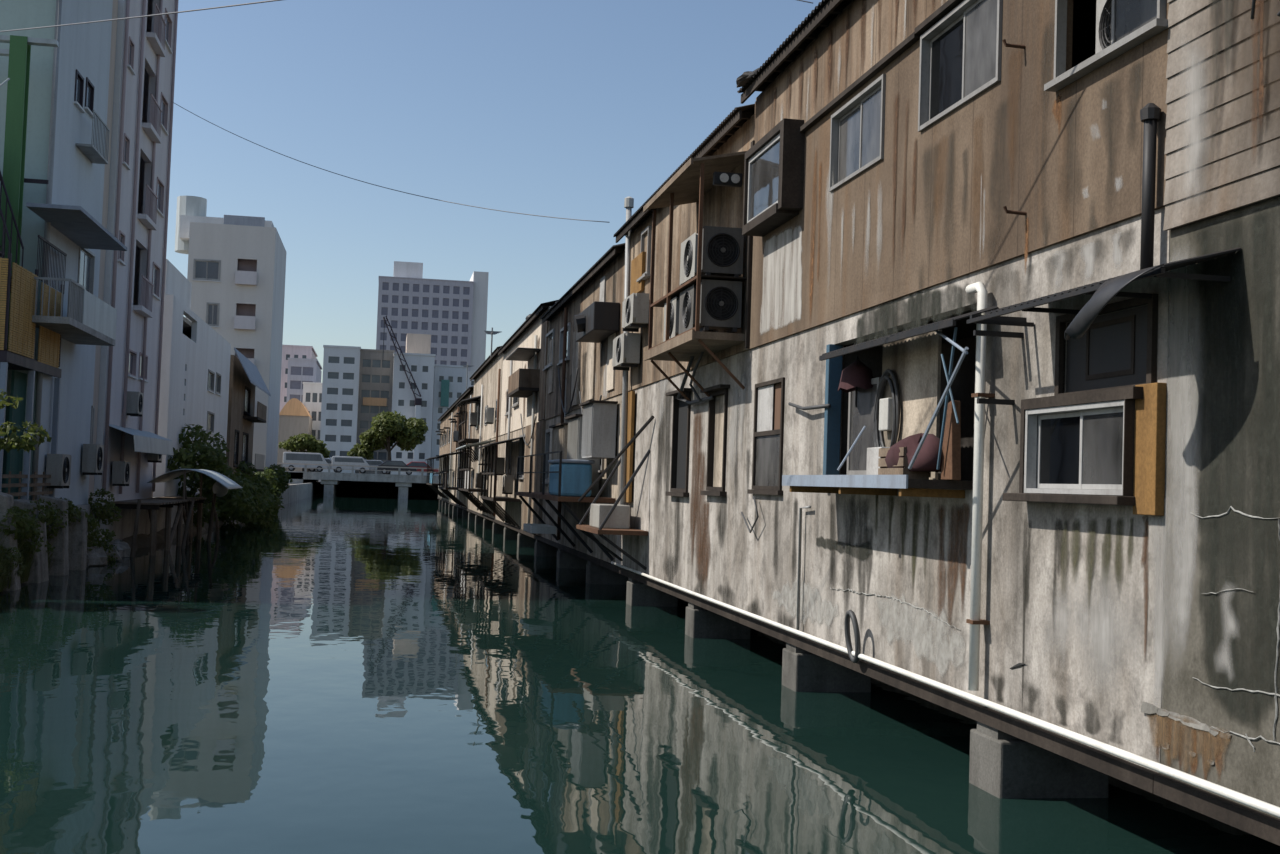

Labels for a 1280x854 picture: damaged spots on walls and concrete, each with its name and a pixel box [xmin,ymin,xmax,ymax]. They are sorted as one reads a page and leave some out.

leakage [1188,0,1232,184]
corrosion [938,506,969,619]
leakage [1022,536,1034,711]
leakage [1058,699,1066,725]
leakage [1053,519,1133,669]
leakage [1086,705,1115,733]
leakage [1153,210,1280,722]
crack [1191,506,1280,541]
crack [1192,588,1280,752]